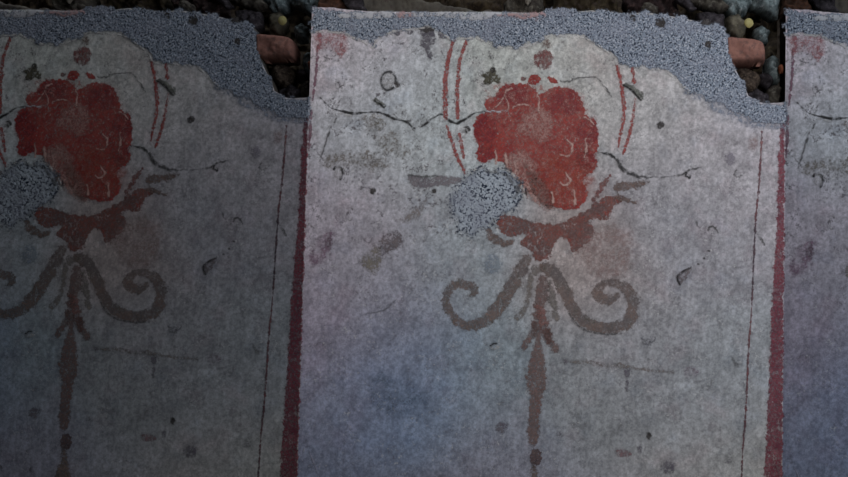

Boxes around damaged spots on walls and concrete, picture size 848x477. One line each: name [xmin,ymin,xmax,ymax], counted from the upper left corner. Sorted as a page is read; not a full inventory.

flaking render [0,0,311,123]
flaking render [308,0,788,129]
flaking render [784,8,848,48]
flaking render [0,159,63,229]
crack [320,97,501,155]
flaking render [447,164,526,238]
crack [602,152,699,179]
crack [797,102,847,168]